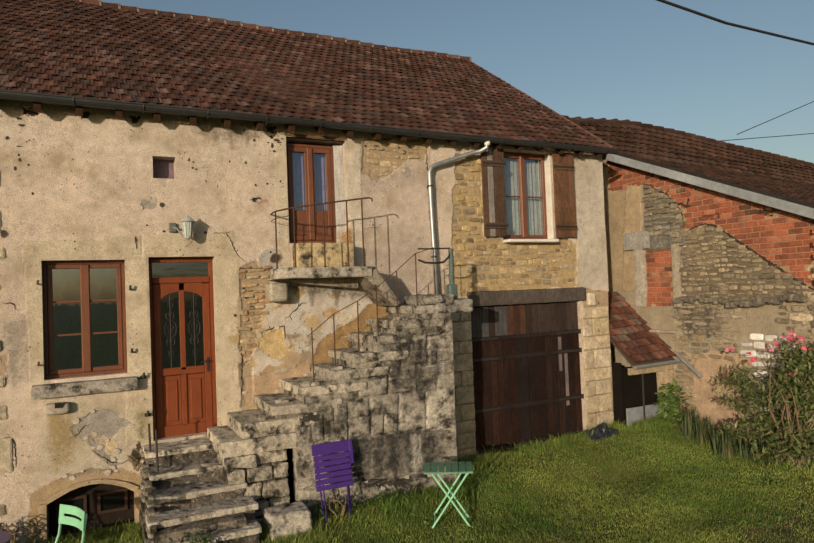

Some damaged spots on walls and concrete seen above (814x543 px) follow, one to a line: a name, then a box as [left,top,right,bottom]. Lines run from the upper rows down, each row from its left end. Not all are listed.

peeling [242,301,389,403]
flaking render [58,408,141,480]